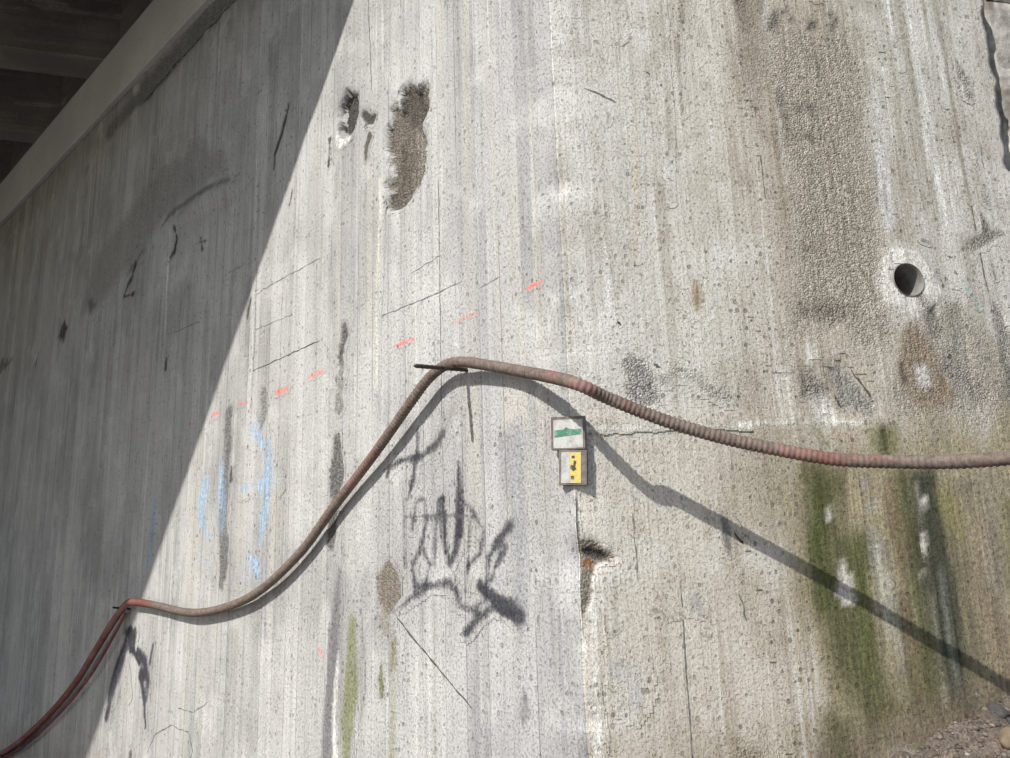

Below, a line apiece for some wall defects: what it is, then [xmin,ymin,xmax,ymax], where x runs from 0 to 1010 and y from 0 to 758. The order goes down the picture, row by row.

crack [366,0,374,90]
spalling [326,76,434,216]
leakage [586,421,672,435]
leakage [646,0,1010,758]
peeling [574,488,658,758]